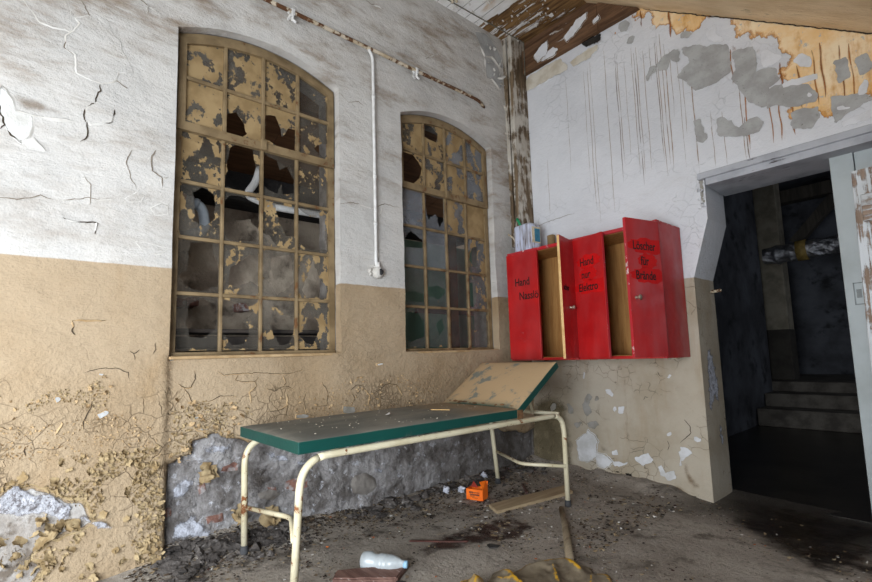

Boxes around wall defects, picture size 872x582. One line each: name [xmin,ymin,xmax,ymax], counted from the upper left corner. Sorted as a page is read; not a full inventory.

peeling [0,84,115,152]
peeling [526,44,600,92]
peeling [645,31,820,144]
peeling [831,93,872,123]
peeling [833,53,872,83]
crack [126,150,168,189]
crack [0,176,113,234]
crack [88,346,156,378]
crack [178,370,402,417]
crack [55,402,92,435]
peeling [567,389,701,481]
flaking render [0,373,534,582]